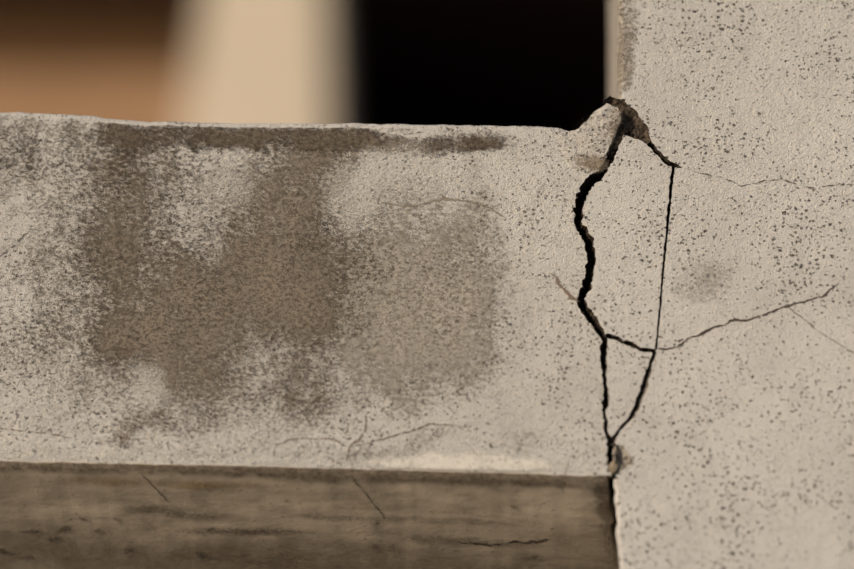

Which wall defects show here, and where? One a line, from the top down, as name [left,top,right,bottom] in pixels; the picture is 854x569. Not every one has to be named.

damp [0,118,509,425]
crack [550,125,853,527]